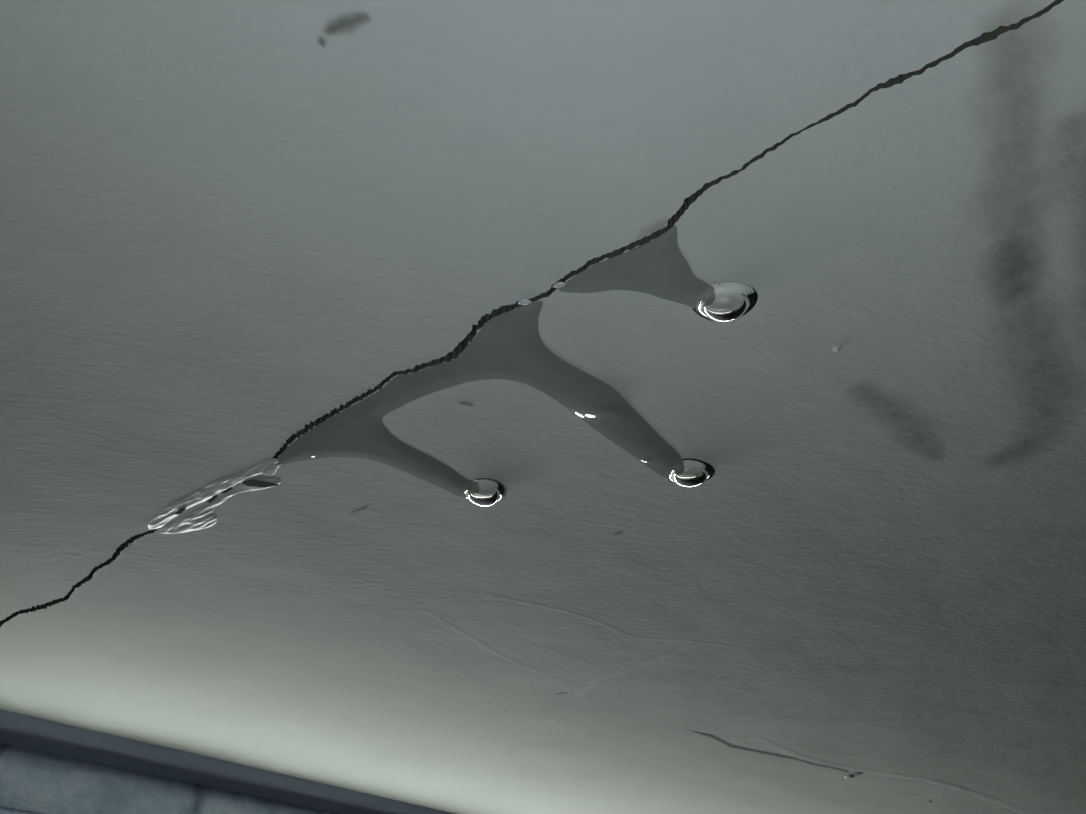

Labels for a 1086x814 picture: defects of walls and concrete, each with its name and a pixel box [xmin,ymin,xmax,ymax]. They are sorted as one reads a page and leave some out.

damp [559,226,758,323]
crack [269,0,1064,459]
damp [277,301,715,507]
crack [0,527,161,631]